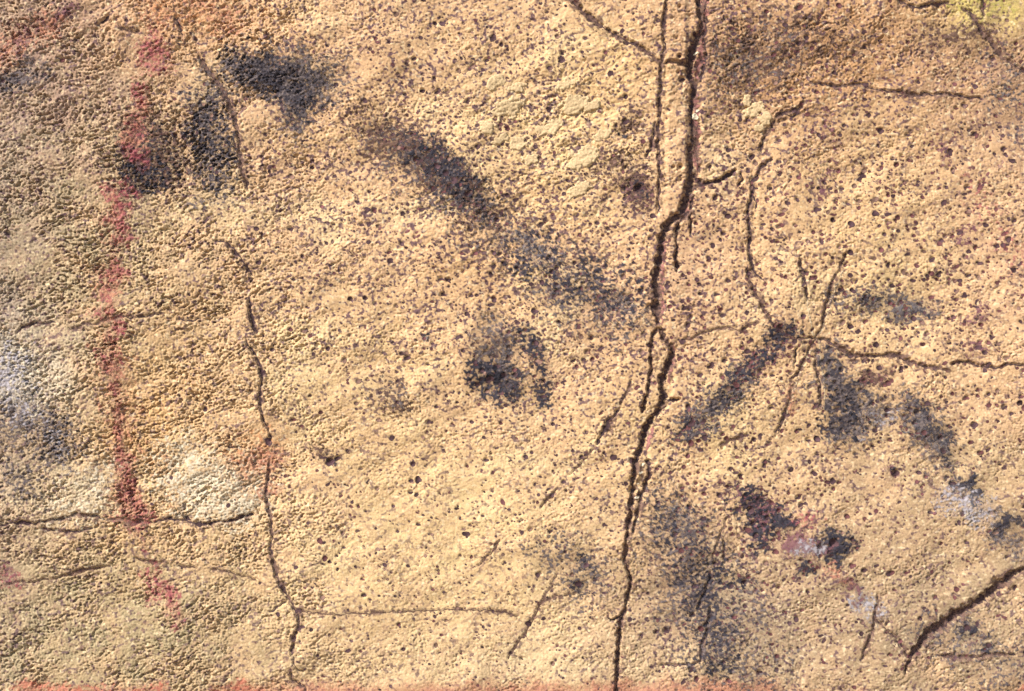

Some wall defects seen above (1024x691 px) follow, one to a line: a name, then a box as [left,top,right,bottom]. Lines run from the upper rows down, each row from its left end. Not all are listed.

crack [0,239,575,691]
crack [541,0,1024,691]